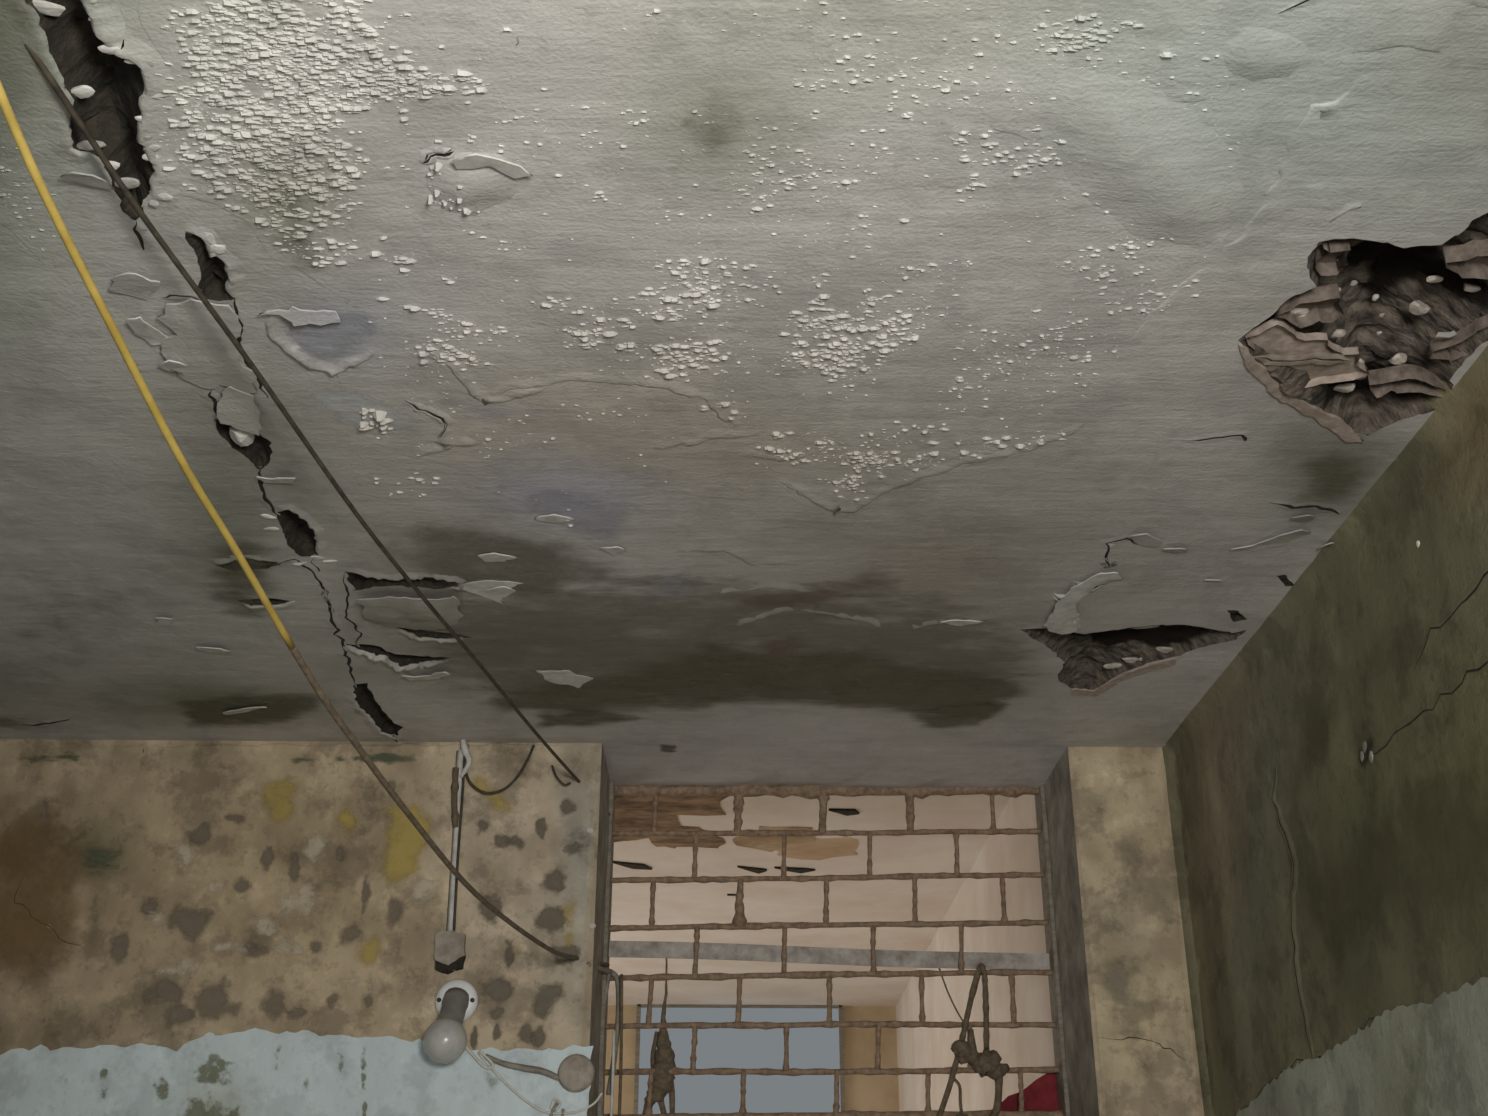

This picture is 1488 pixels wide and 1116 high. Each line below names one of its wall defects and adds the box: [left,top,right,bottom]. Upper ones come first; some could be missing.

crack [1278,0,1320,14]
crack [0,0,295,516]
spalling [1238,201,1488,442]
damp [219,548,263,604]
damp [427,532,1013,728]
spalling [1022,572,1246,697]
damp [187,697,314,724]
crack [342,683,407,742]
damp [0,825,69,965]
flaking render [535,869,579,964]
peeling [0,941,593,1116]
peeling [1236,977,1488,1116]